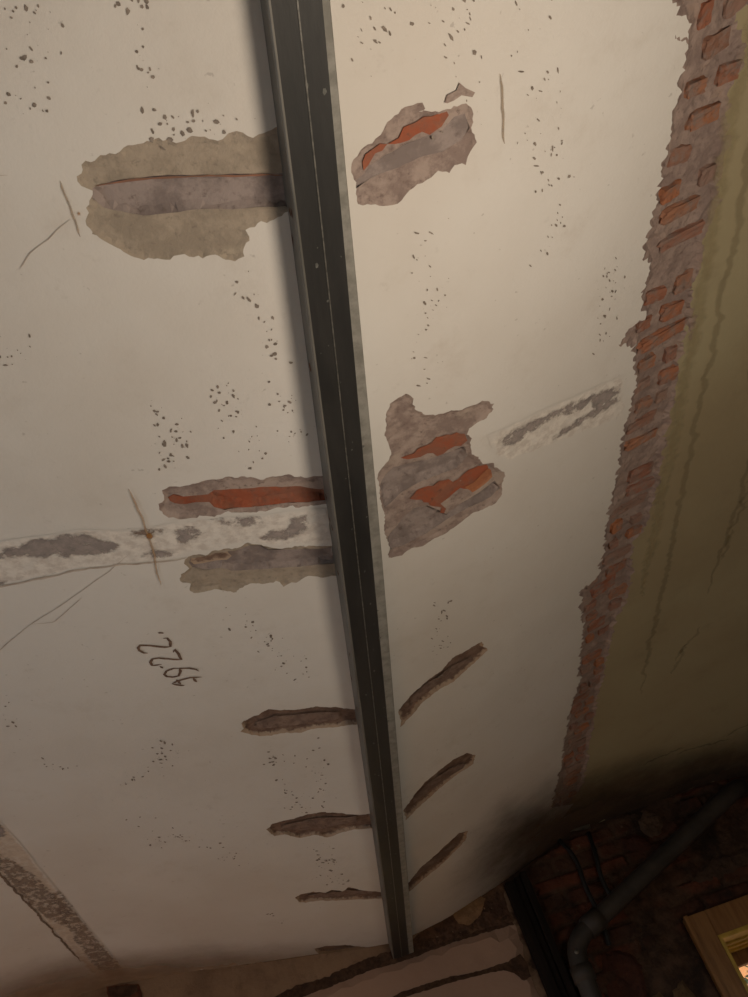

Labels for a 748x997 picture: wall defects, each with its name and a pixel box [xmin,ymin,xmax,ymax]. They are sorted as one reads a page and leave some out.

flaking render [77,103,288,261]
flaking render [351,82,482,206]
flaking render [234,281,278,360]
peeling [0,486,332,588]
flaking render [402,432,467,459]
flaking render [410,464,492,513]
flaking render [487,0,748,806]
peeling [0,822,121,969]